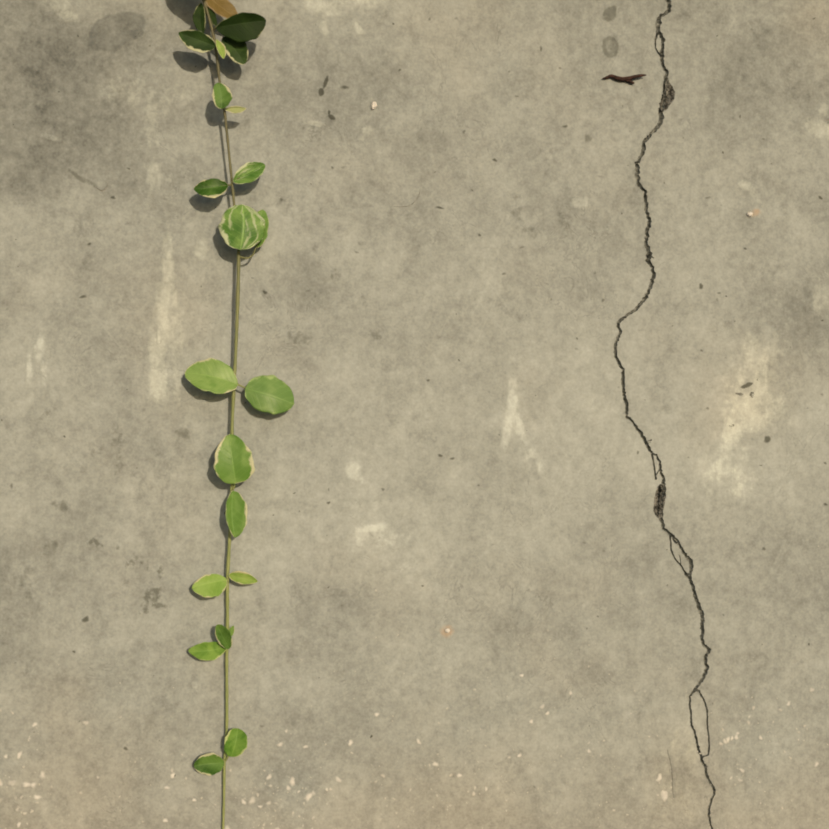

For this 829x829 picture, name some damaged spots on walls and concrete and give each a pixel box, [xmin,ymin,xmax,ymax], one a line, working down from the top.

crack [614,0,716,829]